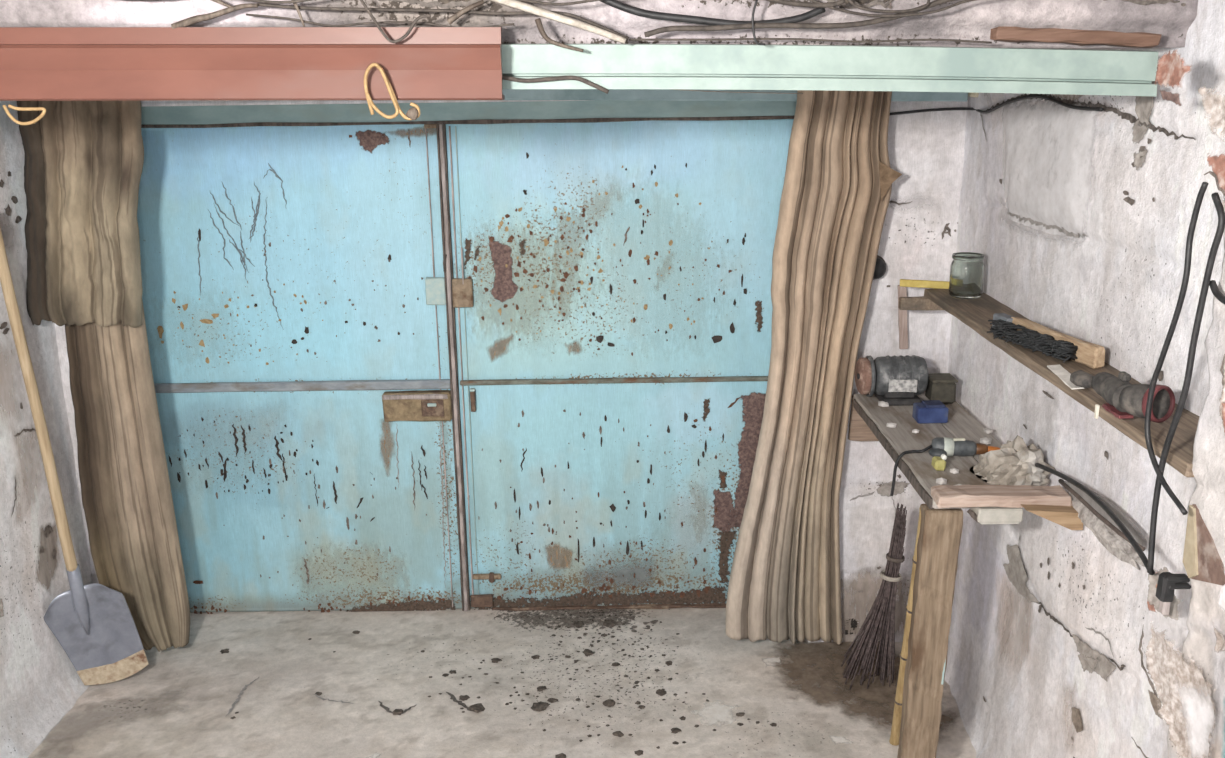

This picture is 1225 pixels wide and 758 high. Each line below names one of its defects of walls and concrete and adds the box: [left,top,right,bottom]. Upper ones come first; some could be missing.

corrosion [349,128,436,153]
crack [980,94,1195,141]
flaking render [1131,49,1191,170]
flaking render [1198,87,1225,211]
corrosion [464,202,673,360]
corrosion [755,300,763,332]
corrosion [202,424,326,522]
corrosion [303,421,455,612]
corrosion [474,392,766,610]
flaking render [1138,567,1216,758]
hole [1071,707,1083,740]